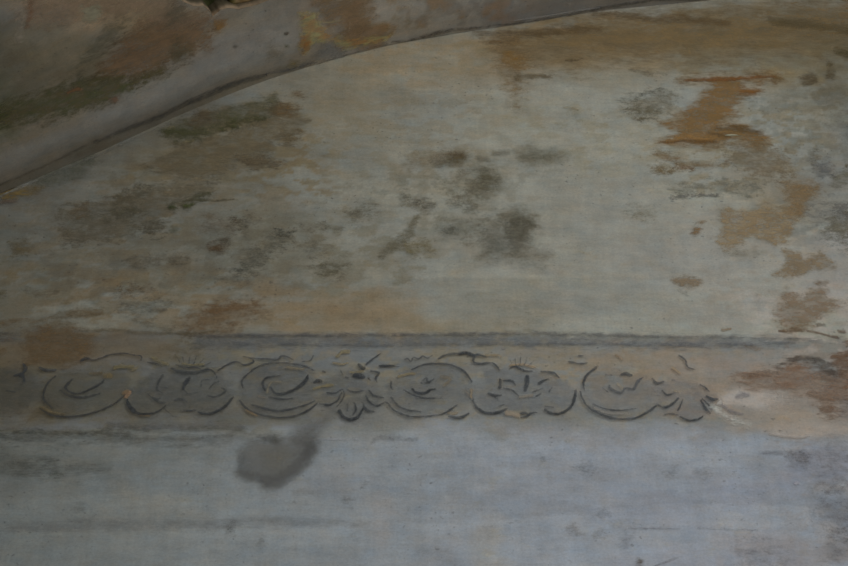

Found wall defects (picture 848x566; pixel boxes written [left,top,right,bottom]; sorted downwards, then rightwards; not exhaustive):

spalling [182,0,267,16]